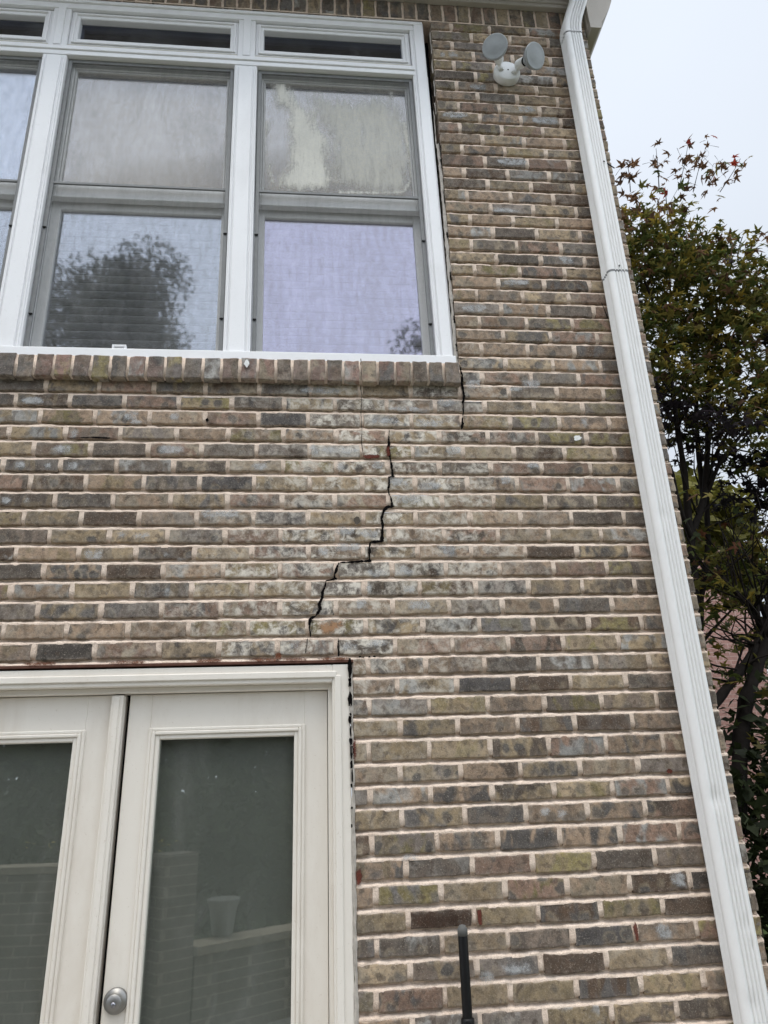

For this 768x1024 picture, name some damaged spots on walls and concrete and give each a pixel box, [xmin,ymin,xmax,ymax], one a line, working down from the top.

crack [305,359,395,654]
crack [458,365,466,429]